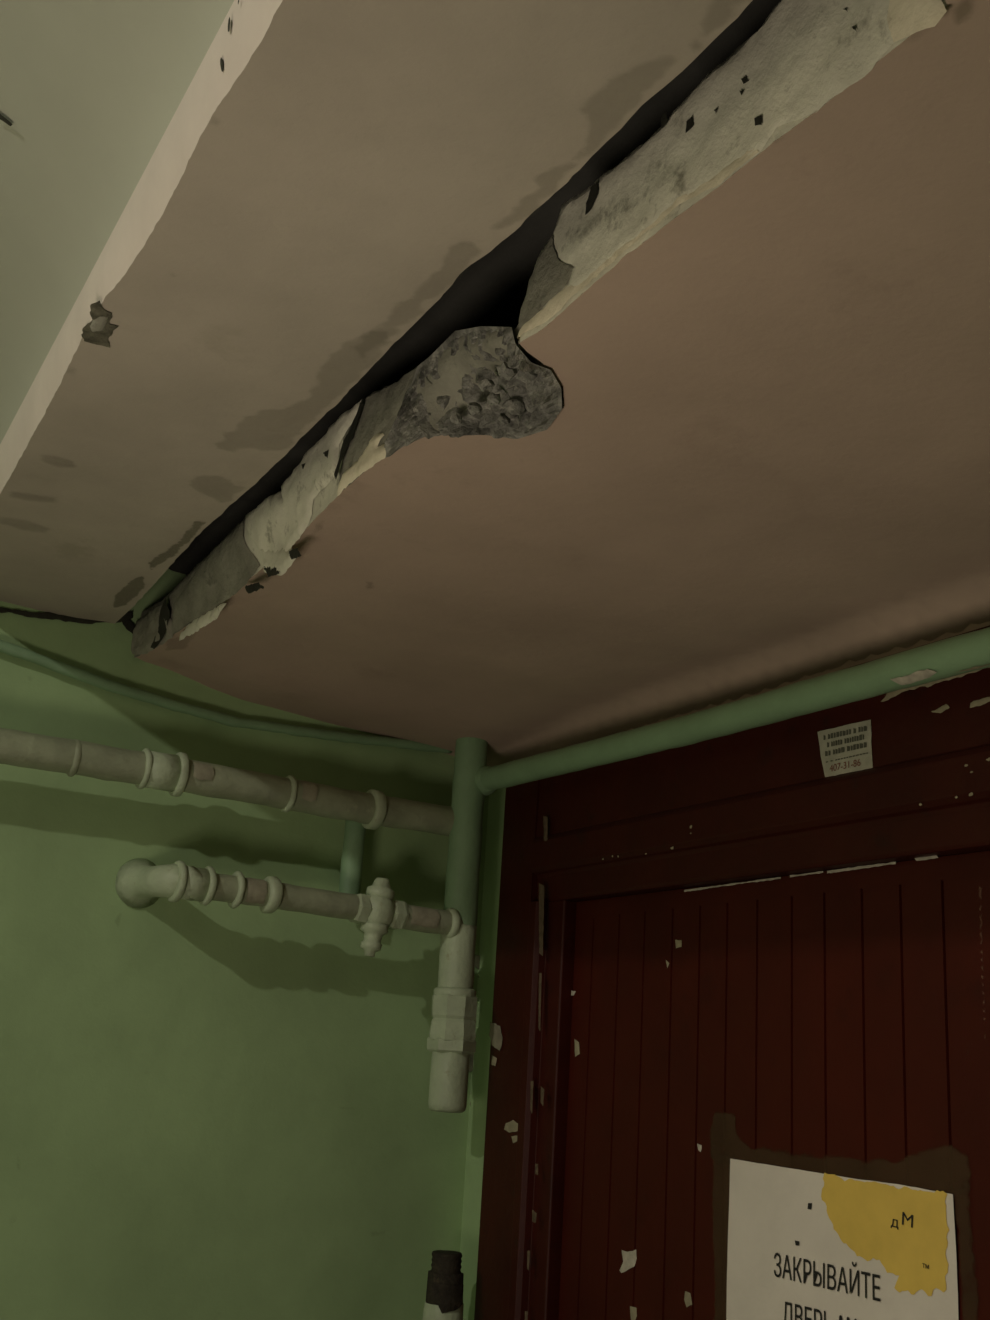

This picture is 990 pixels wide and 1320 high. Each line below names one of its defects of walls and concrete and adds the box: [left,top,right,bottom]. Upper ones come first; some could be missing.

crack [168,0,781,575]
peeling [131,0,947,655]